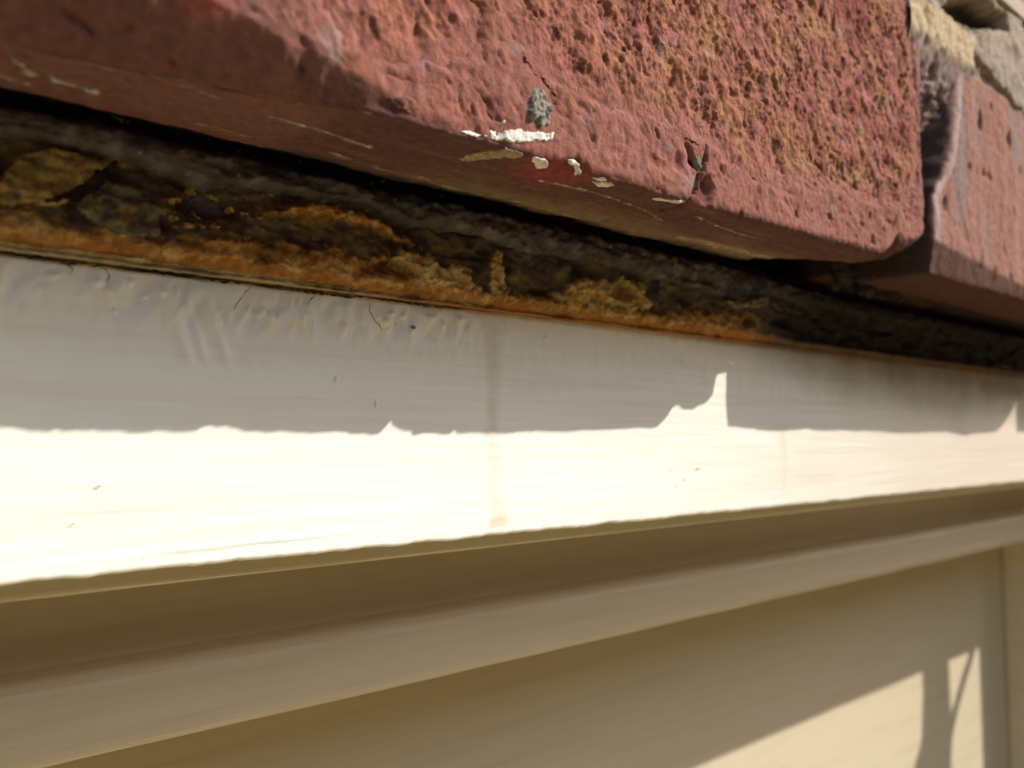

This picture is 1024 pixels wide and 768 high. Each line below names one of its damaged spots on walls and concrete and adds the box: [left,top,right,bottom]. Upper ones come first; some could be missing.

spalling [498,0,921,206]
corrosion [0,147,769,335]
water stain [675,236,785,259]